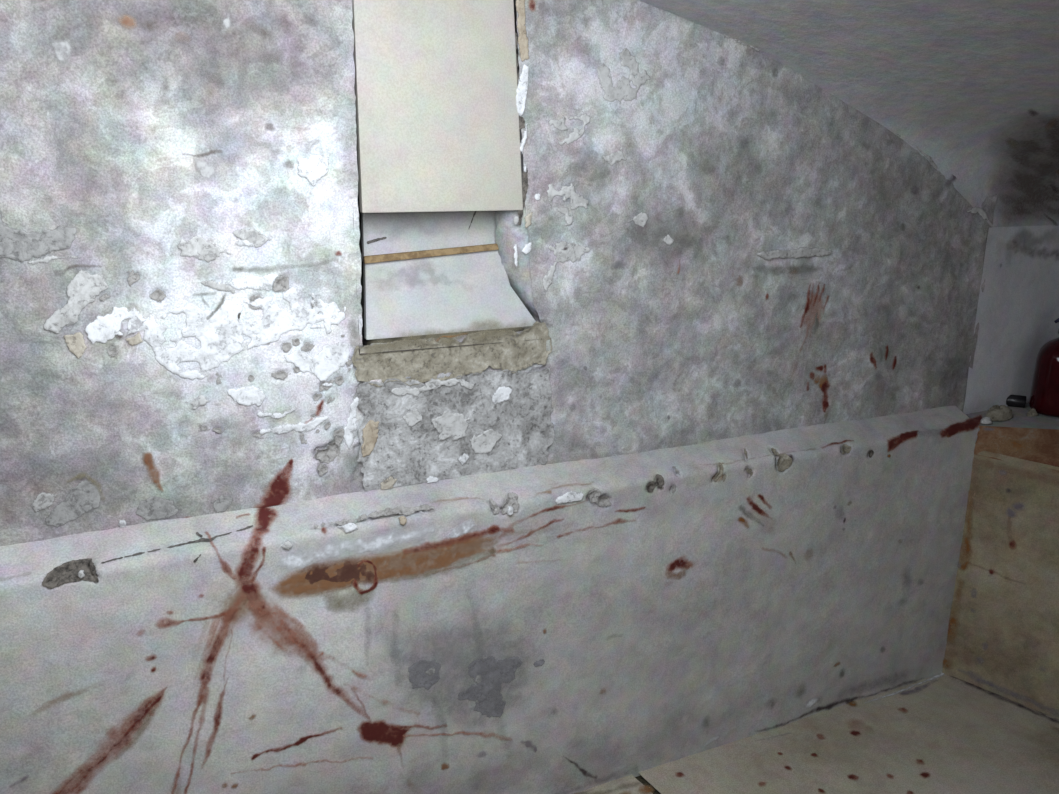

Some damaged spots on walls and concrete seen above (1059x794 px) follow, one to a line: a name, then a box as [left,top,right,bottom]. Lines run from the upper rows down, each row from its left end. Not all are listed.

water stain [1006,111,1059,219]
spalling [0,210,555,492]
water stain [159,459,494,793]